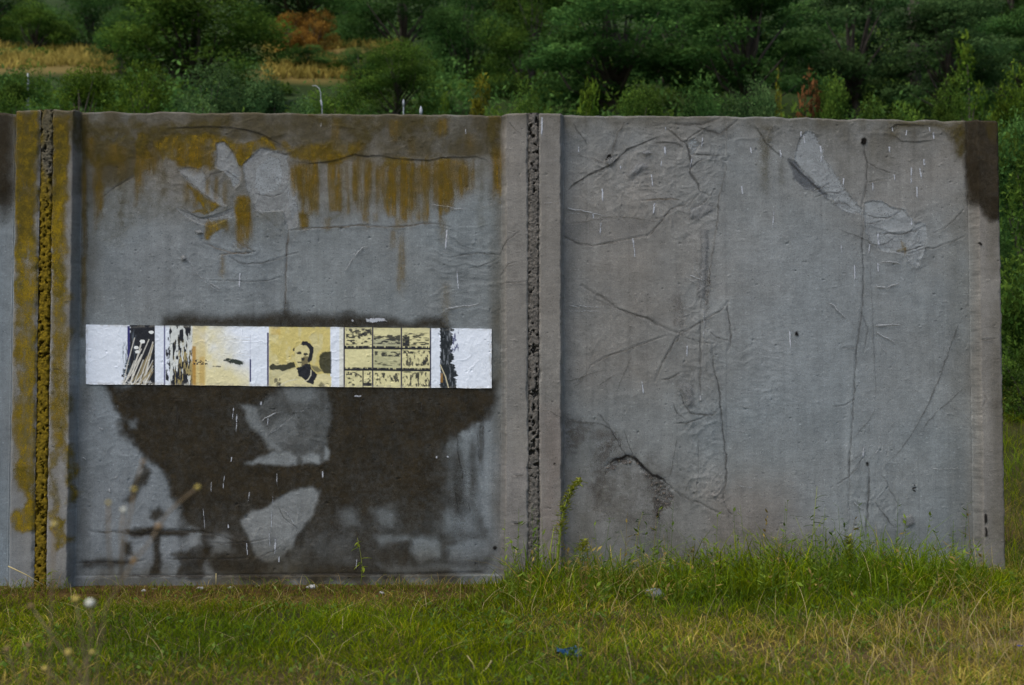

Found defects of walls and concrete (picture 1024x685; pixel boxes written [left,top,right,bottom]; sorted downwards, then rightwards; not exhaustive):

peeling [789,130,928,267]
water stain [959,120,999,221]
water stain [84,382,495,581]
crack [610,455,665,481]